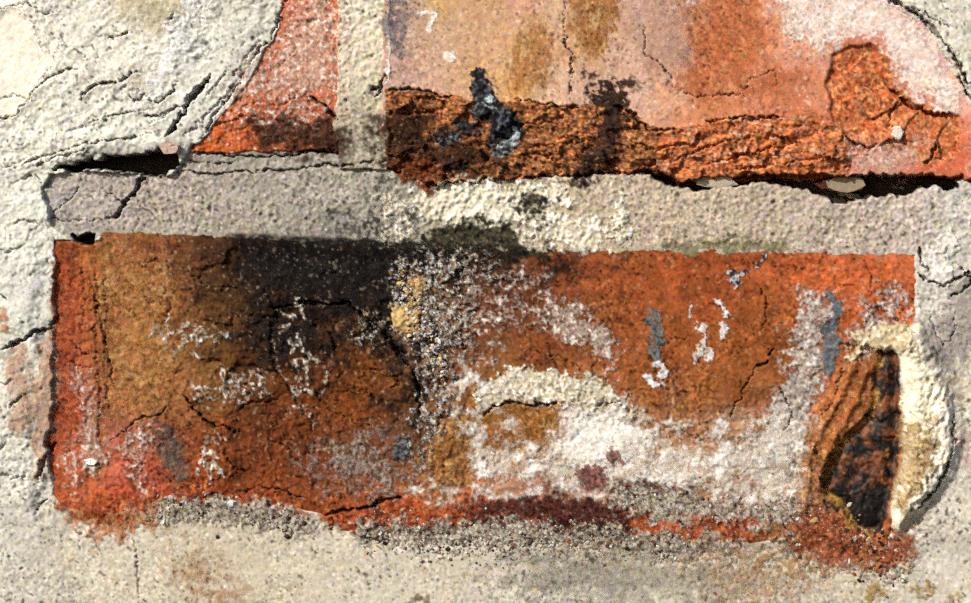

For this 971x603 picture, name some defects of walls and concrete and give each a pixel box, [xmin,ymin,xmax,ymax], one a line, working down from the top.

leakage [217,0,349,153]
spalling [381,42,961,187]
spalling [43,233,96,452]
leakage [3,70,971,508]
spalling [125,493,325,539]
spalling [348,484,913,584]